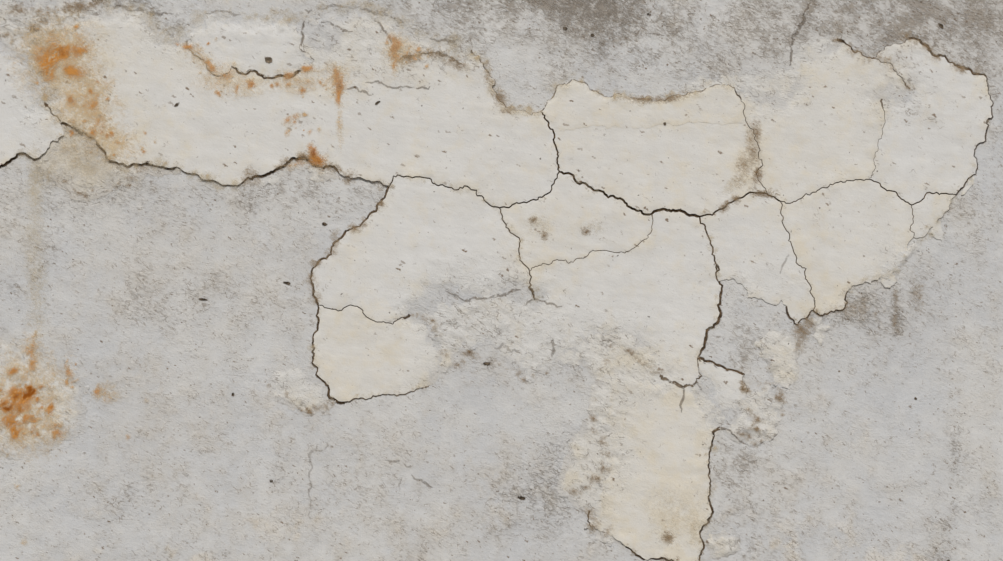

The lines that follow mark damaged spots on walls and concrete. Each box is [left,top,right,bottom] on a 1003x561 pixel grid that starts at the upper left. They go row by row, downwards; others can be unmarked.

crack [0,152,40,168]
rust [22,25,126,160]
crack [42,96,353,186]
rust [183,45,254,94]
crack [186,41,301,79]
rust [271,66,343,104]
rust [308,146,323,166]
crack [309,34,994,404]
peeling [542,34,993,324]
peeling [0,0,801,561]
rust [0,344,60,442]
crack [587,427,720,561]